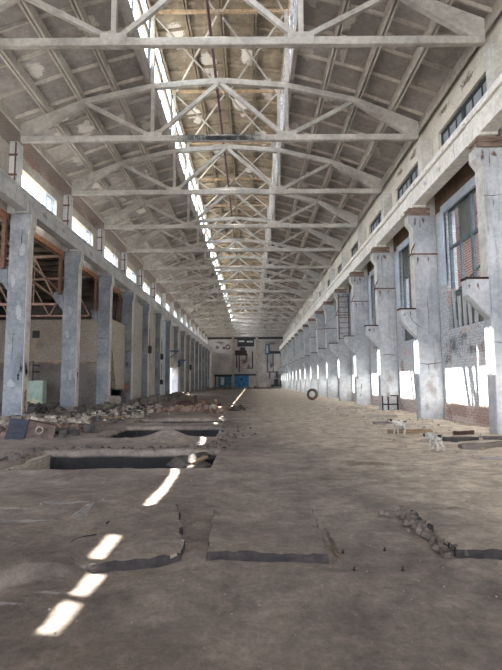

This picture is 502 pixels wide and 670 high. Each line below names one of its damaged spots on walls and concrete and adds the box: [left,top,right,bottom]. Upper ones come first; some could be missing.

peeling [21,62,45,80]
peeling [76,120,95,134]